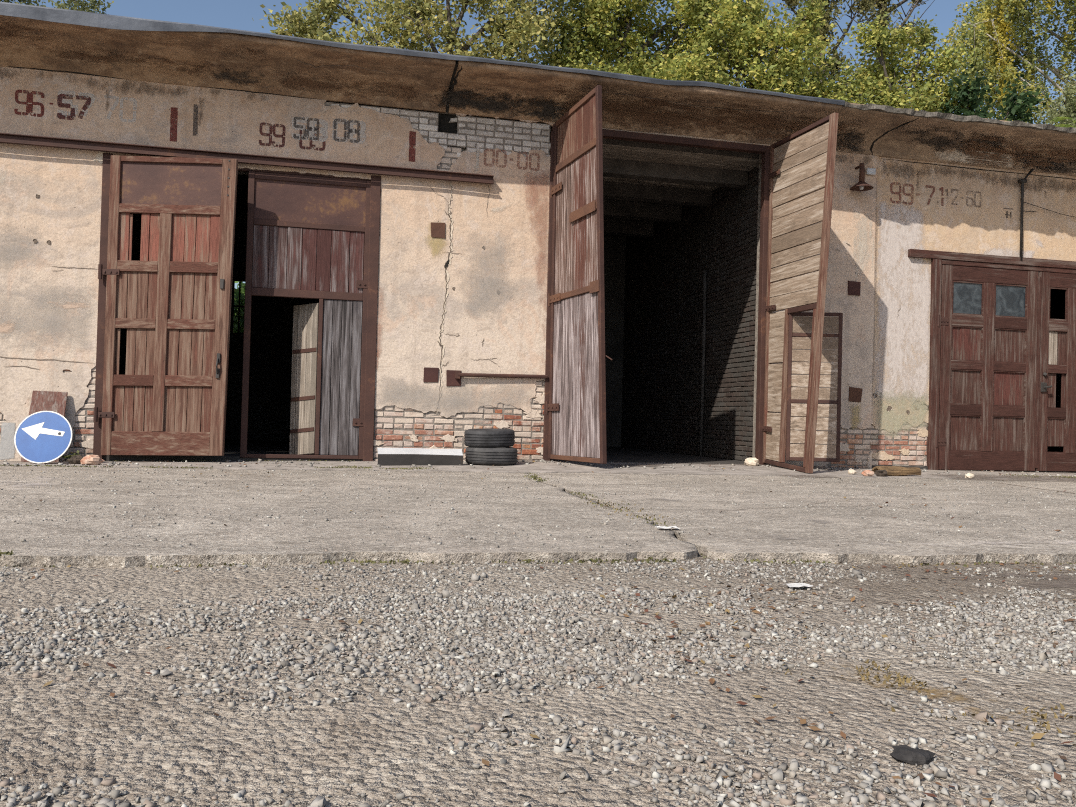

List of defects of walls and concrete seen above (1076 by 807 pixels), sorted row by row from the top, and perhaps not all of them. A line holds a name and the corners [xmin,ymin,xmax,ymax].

flaking render [324,102,551,171]
leakage [907,130,1076,173]
crack [427,181,497,411]
peeling [825,202,931,468]
flaking render [373,380,545,461]